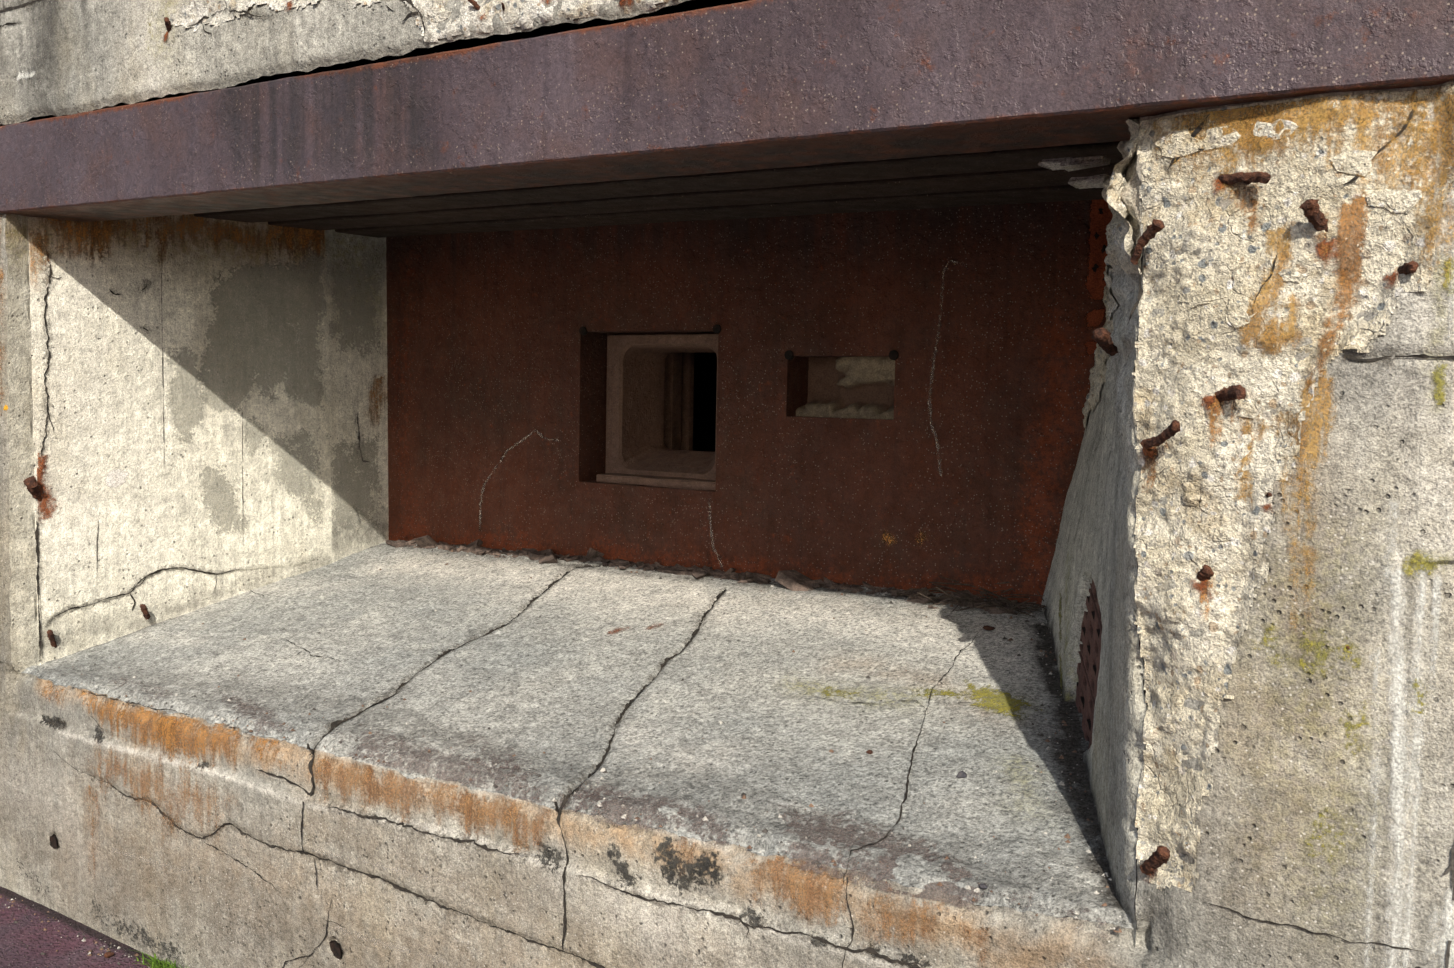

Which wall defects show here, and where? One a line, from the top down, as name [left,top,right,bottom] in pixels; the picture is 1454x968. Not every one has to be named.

spalling [169,0,319,32]
spalling [347,0,381,8]
spalling [403,0,672,42]
crack [39,231,62,460]
rust [1153,87,1454,526]
crack [1342,354,1454,362]
spalling [1082,83,1454,892]
rust [43,681,281,863]
rust [315,755,550,847]
crack [42,564,978,968]
rust [751,856,850,923]
crack [1204,902,1452,968]